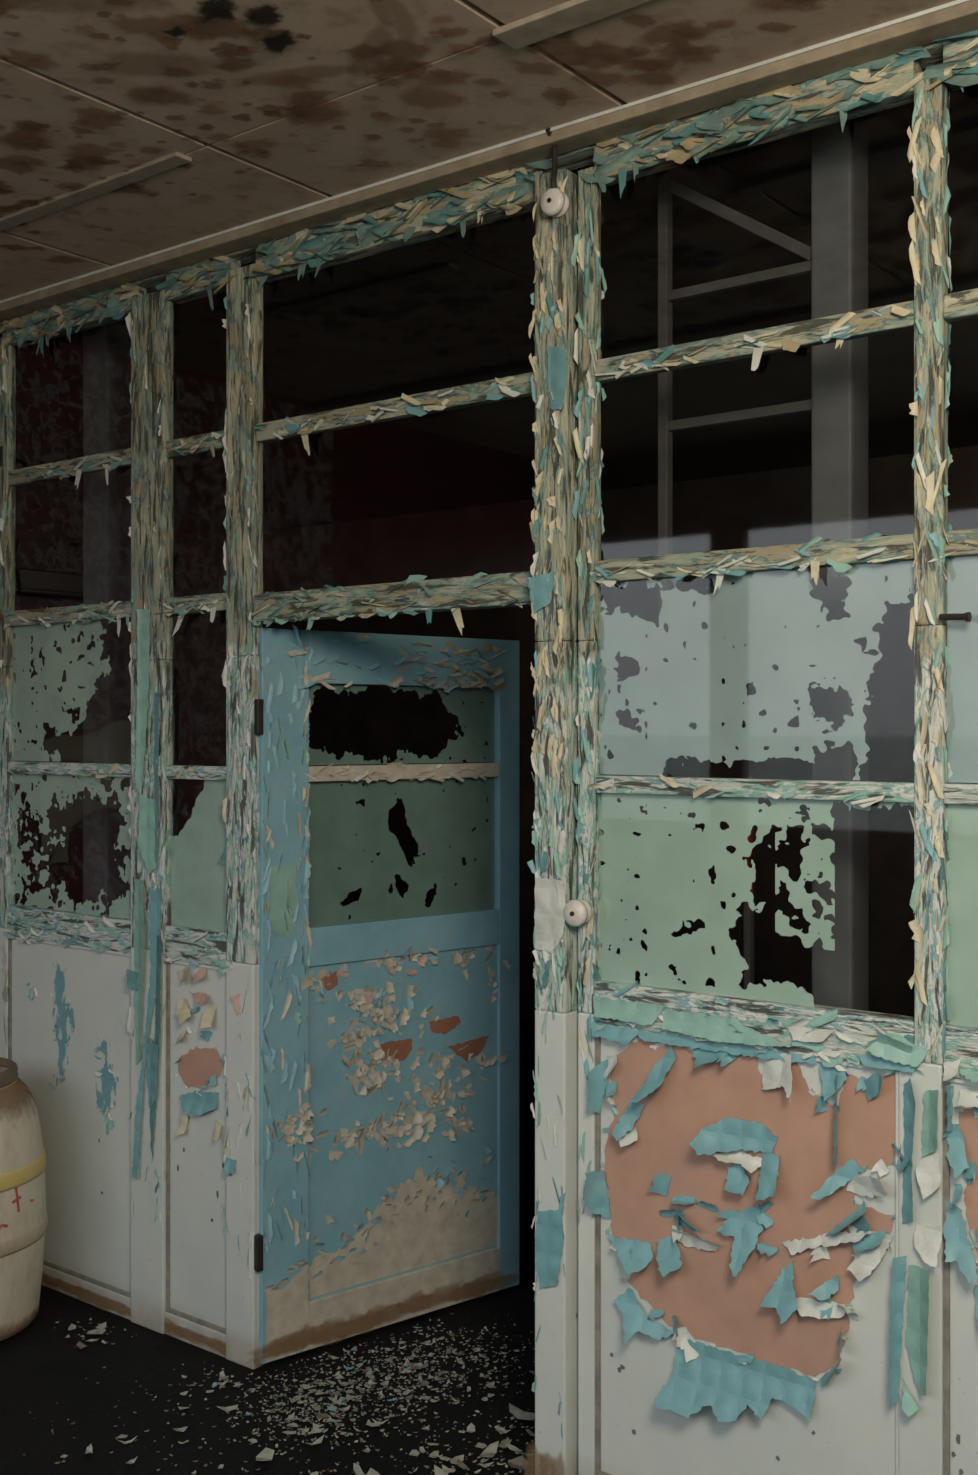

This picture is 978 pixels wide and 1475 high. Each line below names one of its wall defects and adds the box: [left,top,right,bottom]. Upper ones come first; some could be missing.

water stain [0,0,344,263]
water stain [347,17,508,148]
water stain [518,15,734,106]
water stain [759,0,816,31]
peeling [155,30,978,1044]
peeling [0,304,508,1363]
peeling [577,639,978,1435]
peeling [530,1056,565,1161]
peeling [531,1177,566,1301]